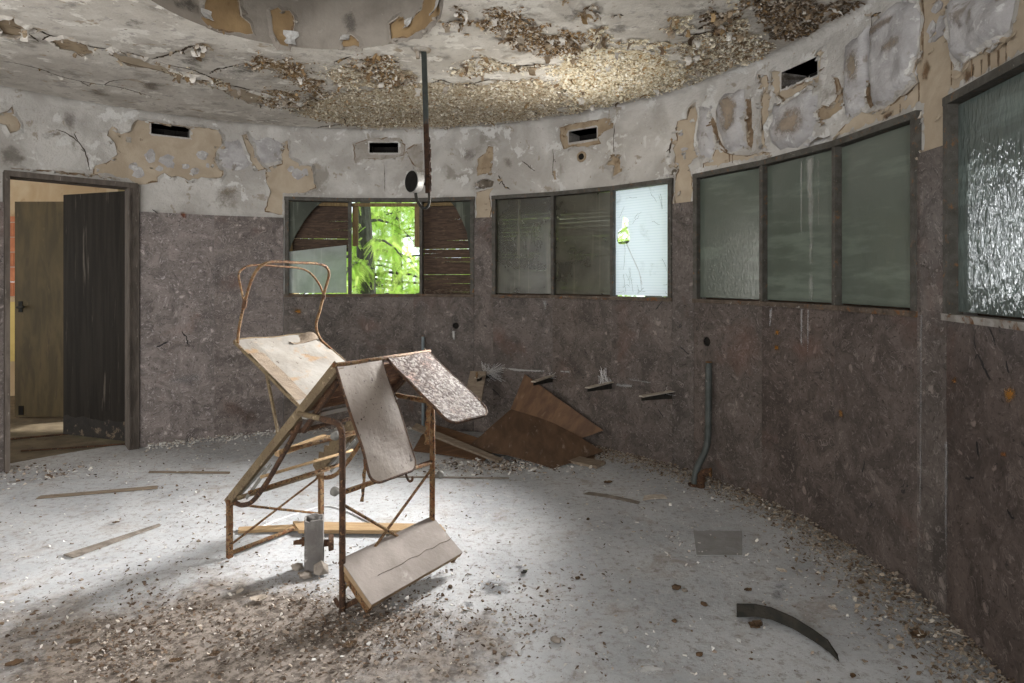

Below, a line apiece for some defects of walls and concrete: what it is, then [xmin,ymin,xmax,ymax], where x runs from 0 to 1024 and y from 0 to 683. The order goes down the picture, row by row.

peeling [0,15,33,42]
crack [5,26,290,102]
peeling [0,104,24,138]
crack [59,130,90,170]
peeling [10,117,319,218]
peeling [45,0,1024,222]